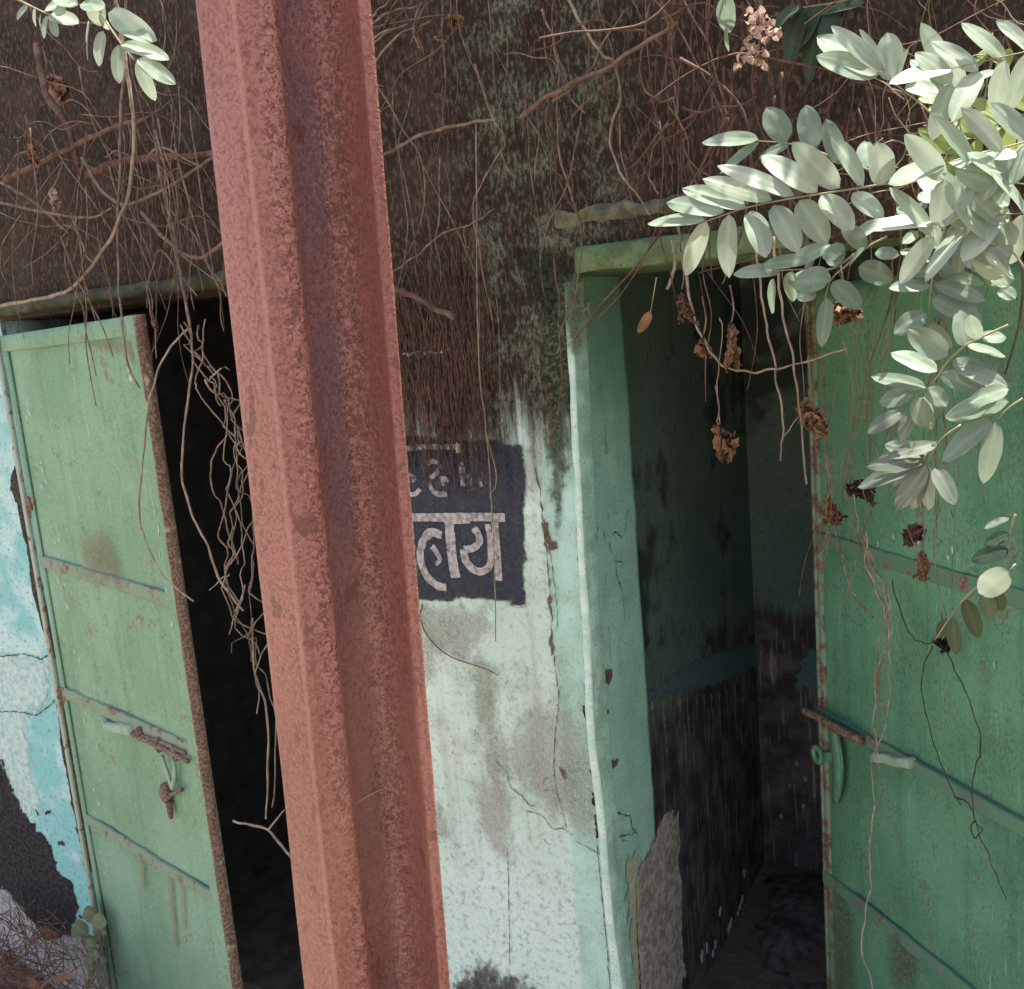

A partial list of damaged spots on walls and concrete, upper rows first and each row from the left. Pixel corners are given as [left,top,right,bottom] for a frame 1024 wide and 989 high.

flaking render [541,522,557,550]
crack [0,649,54,660]
crack [2,692,54,716]
peeling [0,466,105,989]
leakage [476,662,596,851]
crack [496,468,637,989]
peeling [625,810,686,989]